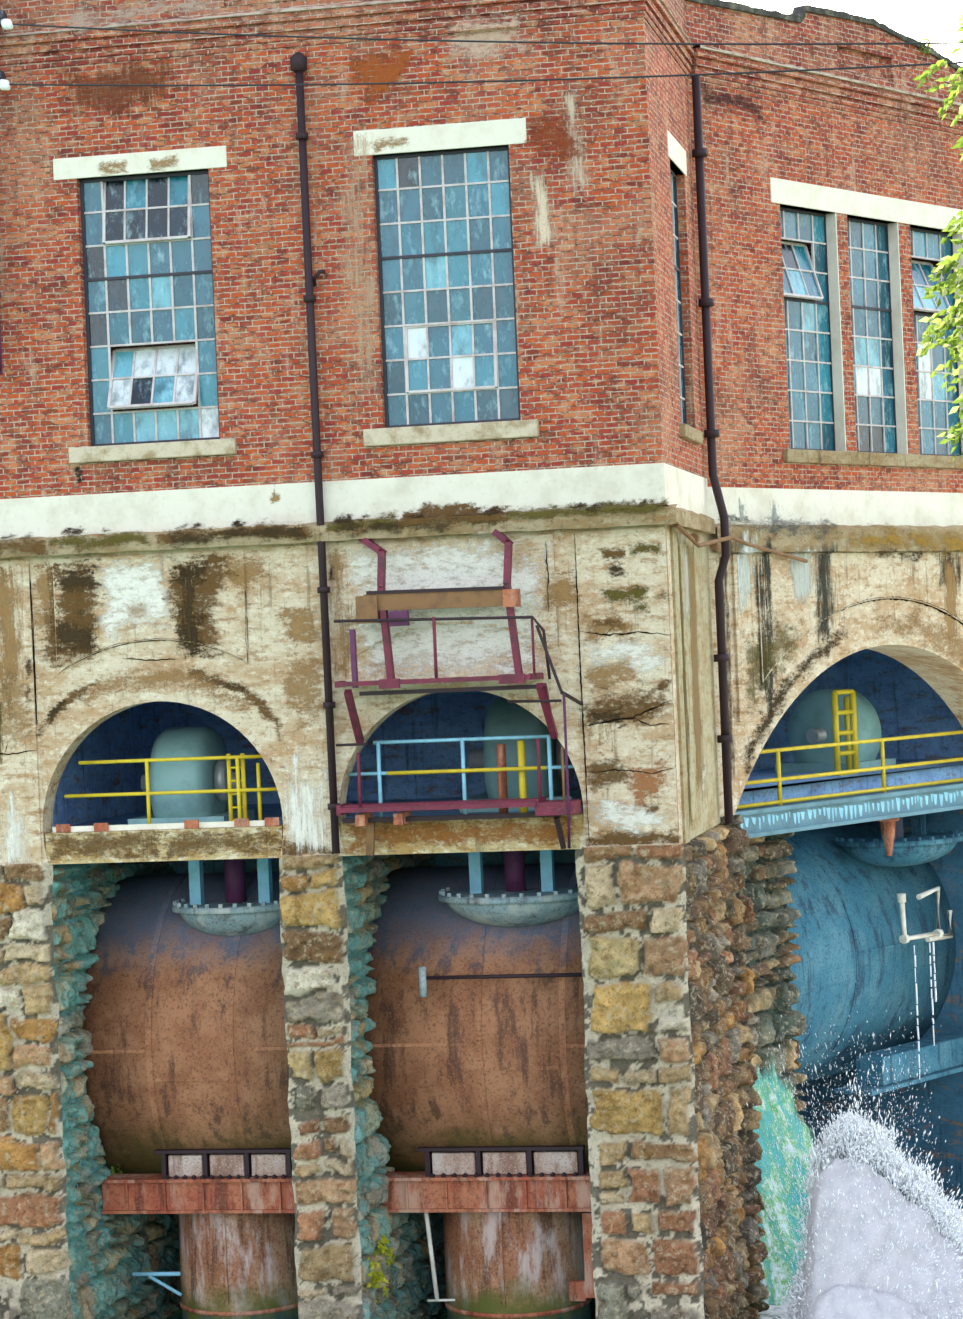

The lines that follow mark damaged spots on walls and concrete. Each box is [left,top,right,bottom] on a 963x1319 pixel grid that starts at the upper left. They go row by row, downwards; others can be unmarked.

leakage [0,512,554,763]
crack [545,534,673,847]
leakage [719,530,848,777]